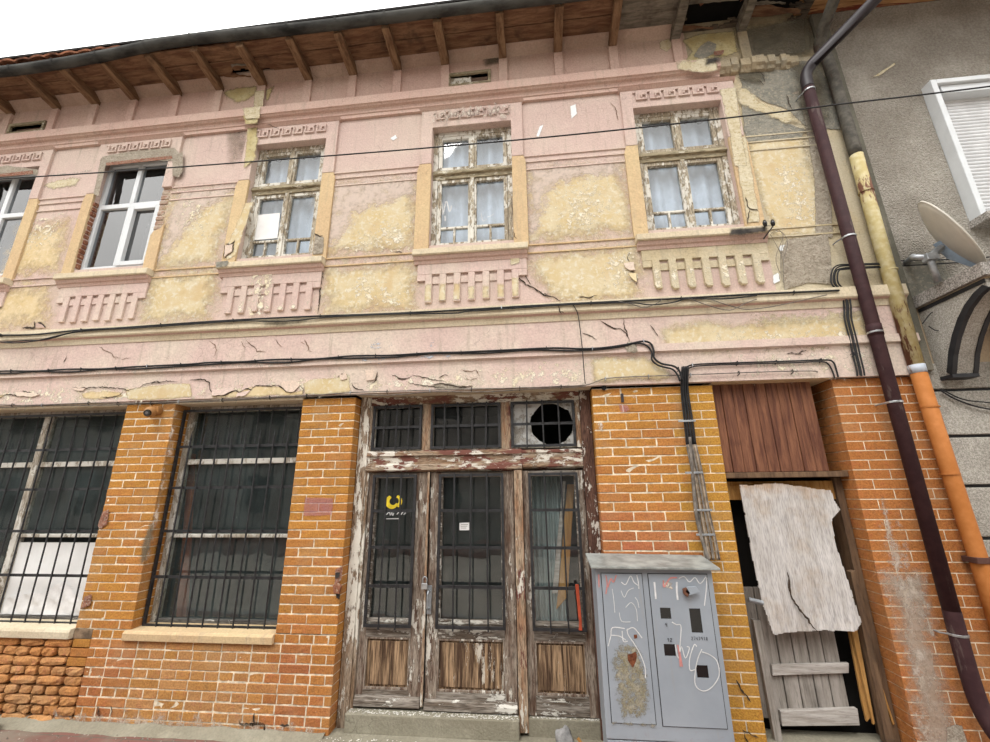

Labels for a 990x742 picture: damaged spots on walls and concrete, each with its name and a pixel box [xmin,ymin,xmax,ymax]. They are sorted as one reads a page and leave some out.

flaking render [677,31,737,72]
peeling [0,207,69,329]
flaking render [45,148,183,270]
peeling [140,184,253,323]
peeling [313,176,519,315]
peeling [527,161,677,302]
peeling [690,260,765,285]
peeling [720,61,841,290]
peeling [0,357,669,411]